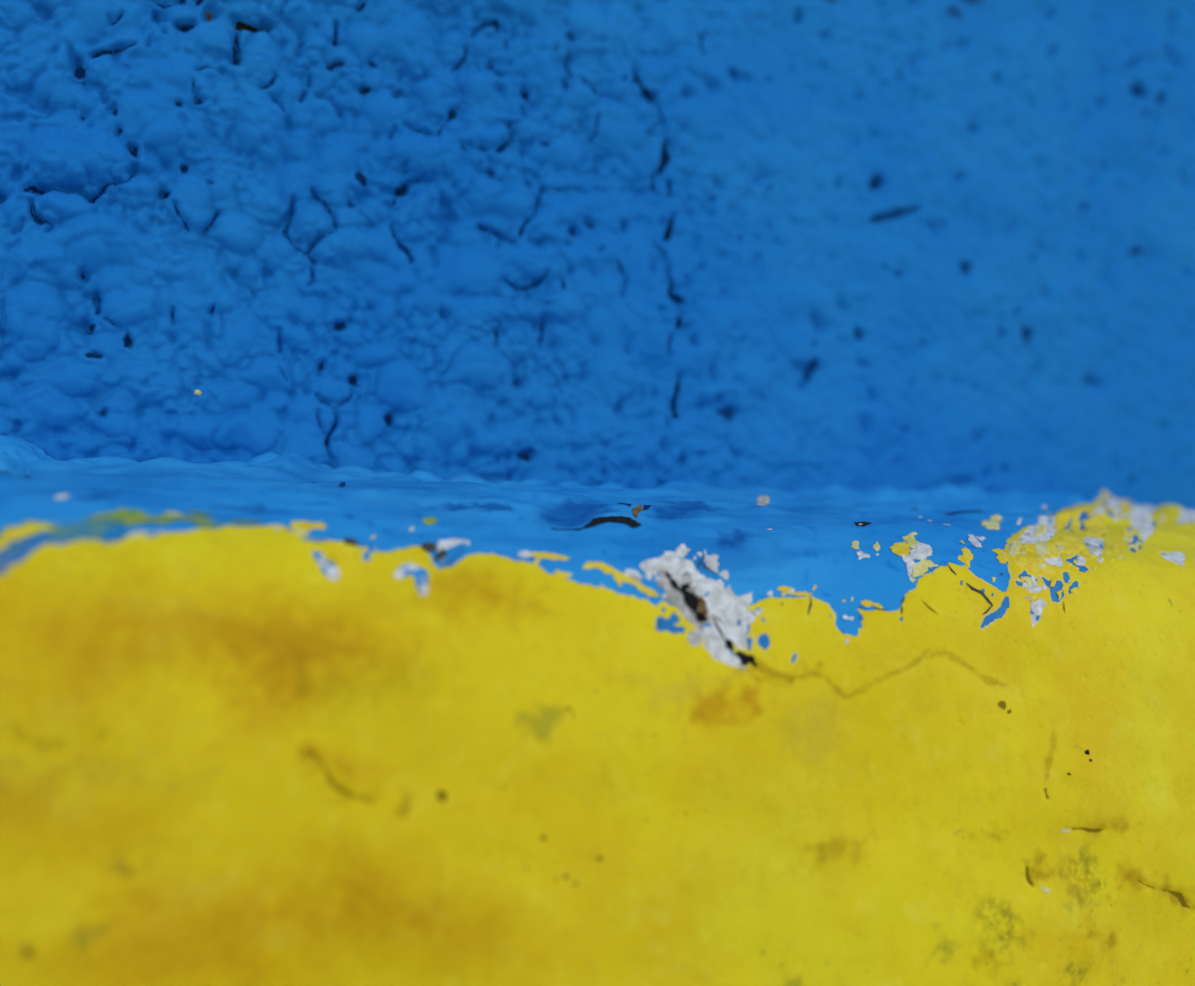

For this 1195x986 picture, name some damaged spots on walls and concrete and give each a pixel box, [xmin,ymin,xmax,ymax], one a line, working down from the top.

peeling [0,533,77,575]
peeling [289,521,327,536]
peeling [318,555,340,581]
peeling [344,535,377,552]
peeling [393,564,429,597]
peeling [409,517,438,531]
peeling [420,538,470,568]
peeling [851,490,1195,628]
spalling [517,544,817,670]
peeling [830,597,883,644]
crack [1128,874,1189,908]